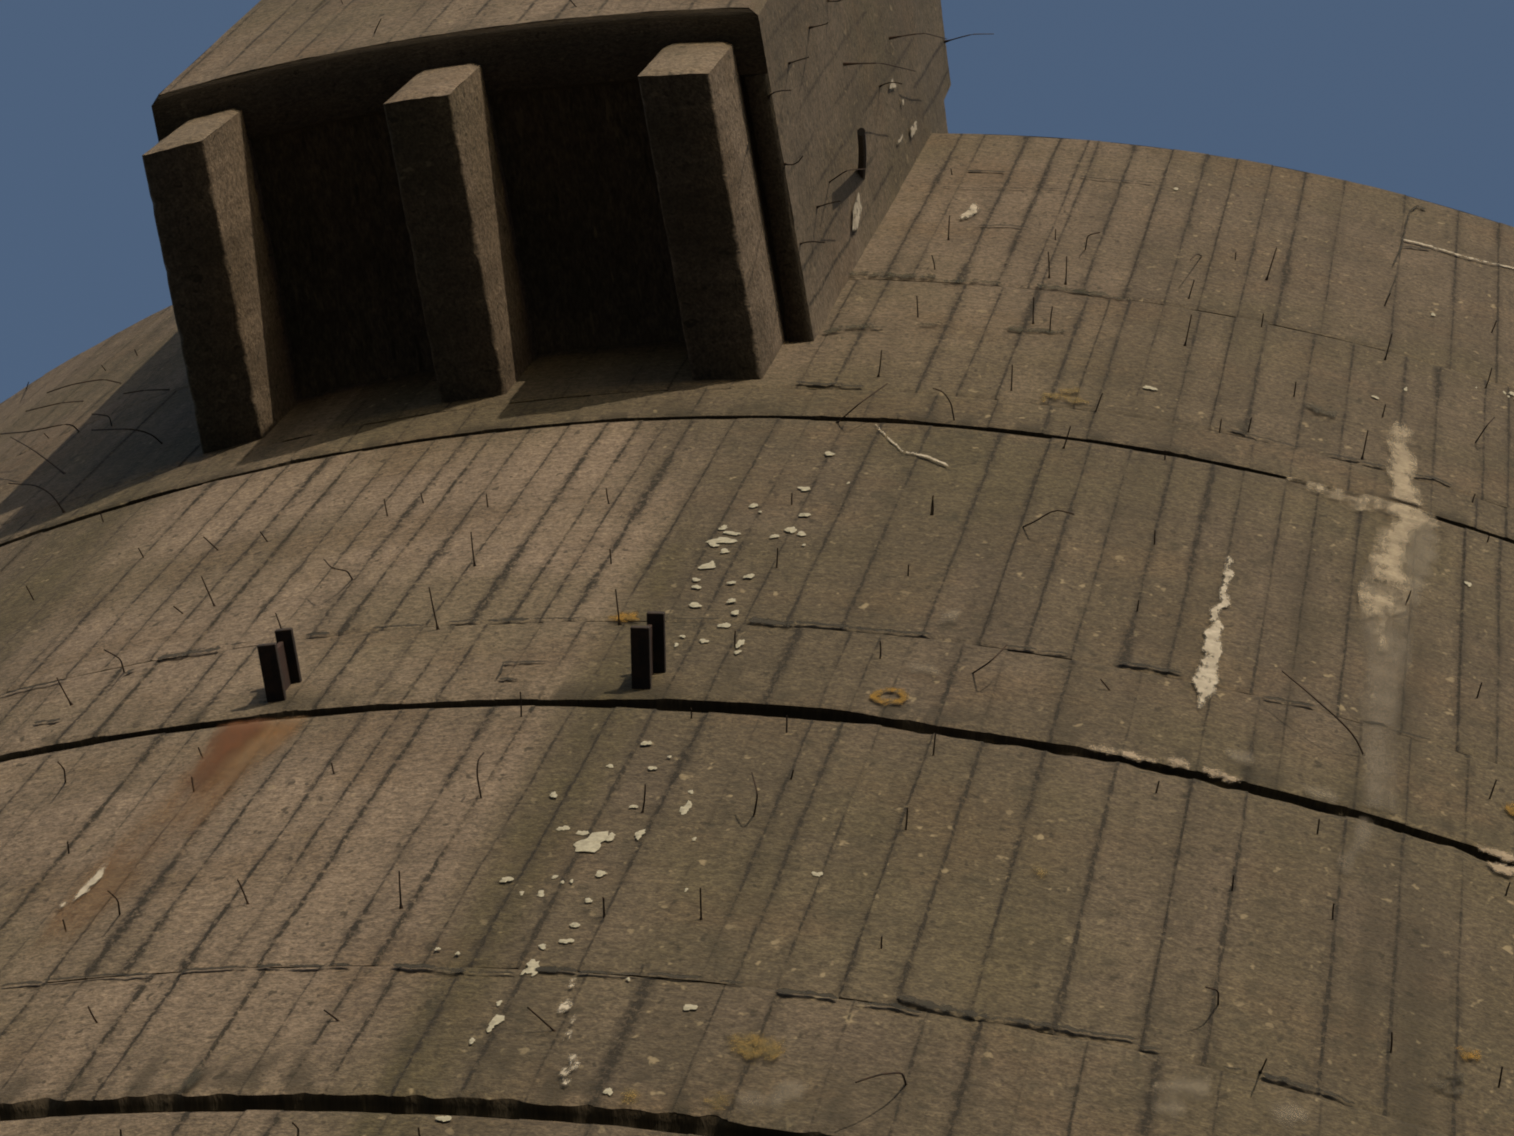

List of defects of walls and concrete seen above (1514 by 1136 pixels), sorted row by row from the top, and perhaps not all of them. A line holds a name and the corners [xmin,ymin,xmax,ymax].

crack [124,642,245,674]
crack [306,617,580,635]
water stain [1193,556,1234,707]
water stain [1308,424,1430,804]
crack [0,679,66,723]
corrosion [208,720,297,773]